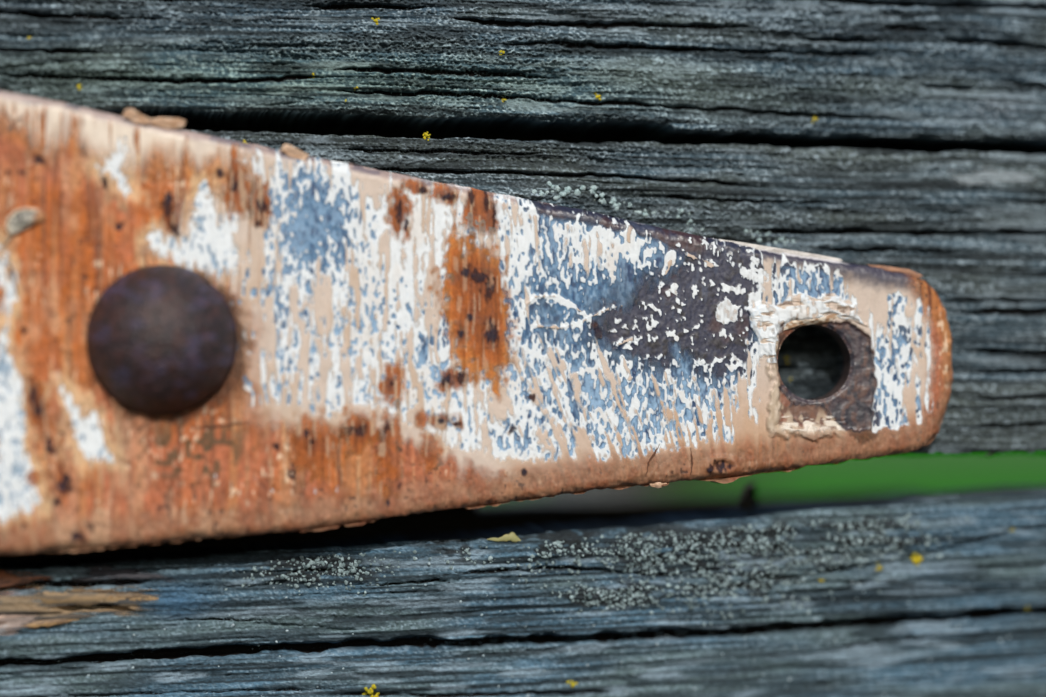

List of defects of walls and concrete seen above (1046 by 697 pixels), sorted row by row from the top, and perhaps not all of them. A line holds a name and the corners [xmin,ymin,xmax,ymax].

corrosion [0,104,953,555]
peeling [146,144,933,463]